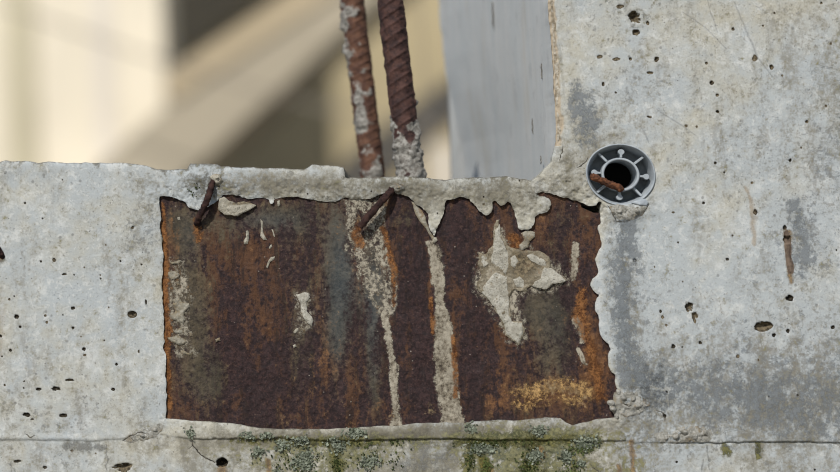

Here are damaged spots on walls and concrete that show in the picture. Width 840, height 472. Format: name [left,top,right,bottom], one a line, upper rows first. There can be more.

rust [161,203,173,409]
peeling [167,259,196,358]
peeling [218,197,256,216]
peeling [260,219,275,268]
peeling [294,292,313,333]
peeling [411,201,438,243]
peeling [474,220,569,346]
rust [510,288,605,411]